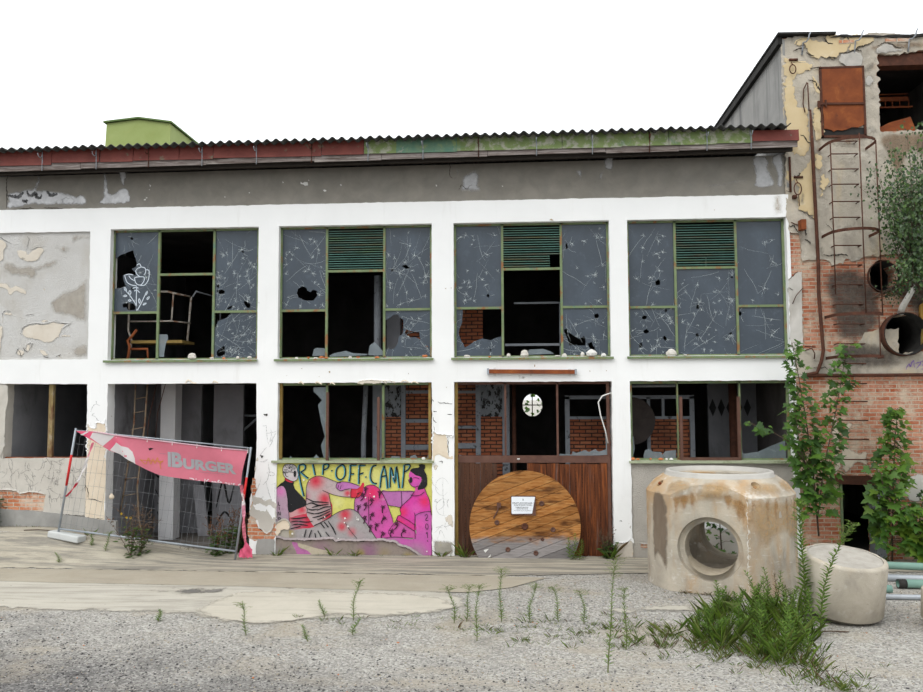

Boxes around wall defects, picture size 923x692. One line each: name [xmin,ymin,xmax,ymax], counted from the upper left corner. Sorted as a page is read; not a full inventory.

peeling [782,34,874,218]
flaking render [17,320,71,355]
flaking render [0,488,46,511]
peeling [248,458,293,541]